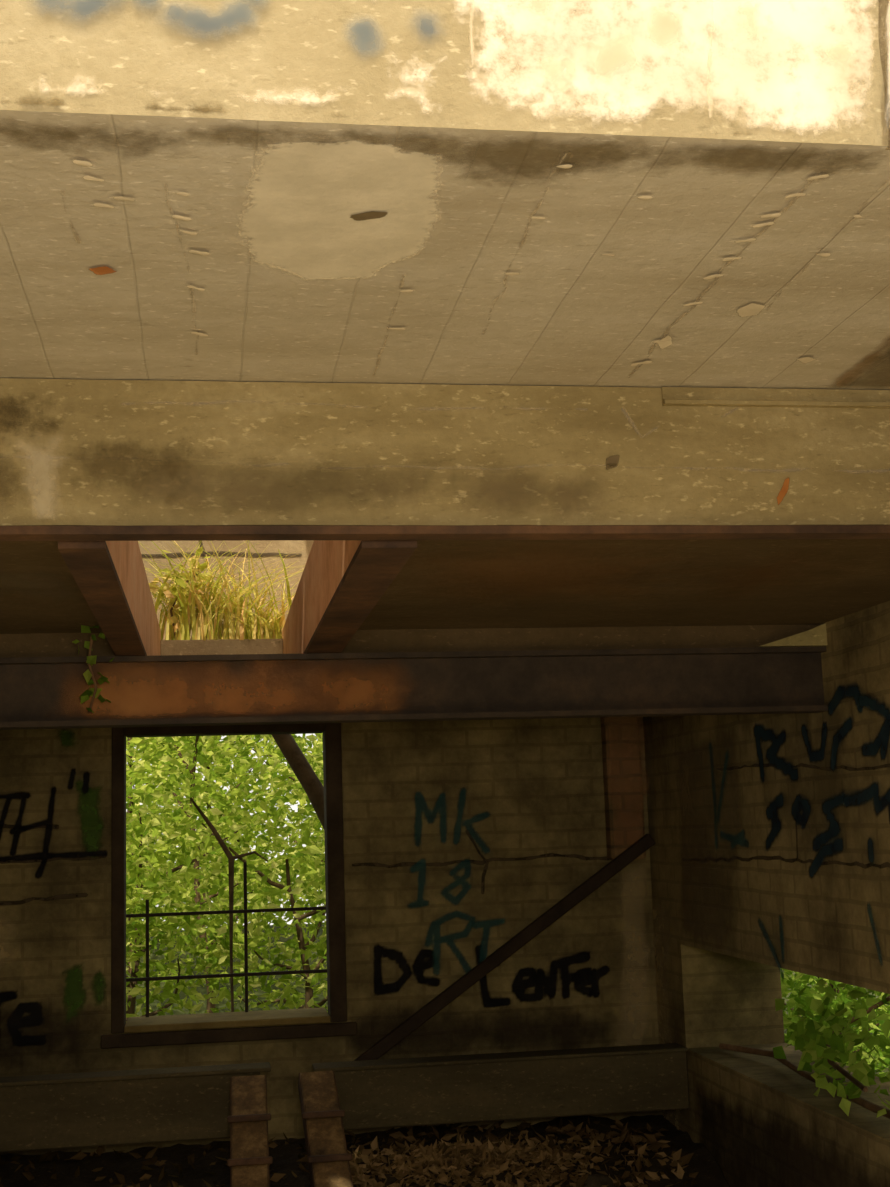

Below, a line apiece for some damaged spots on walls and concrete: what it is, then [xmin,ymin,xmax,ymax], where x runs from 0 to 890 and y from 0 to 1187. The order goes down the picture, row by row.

peeling [458,0,890,150]
spalling [19,83,95,107]
spalling [147,105,223,113]
peeling [273,93,331,103]
water stain [404,137,628,177]
water stain [700,148,853,170]
corrosion [89,266,116,275]
crack [629,175,829,377]
corrosion [79,660,394,718]